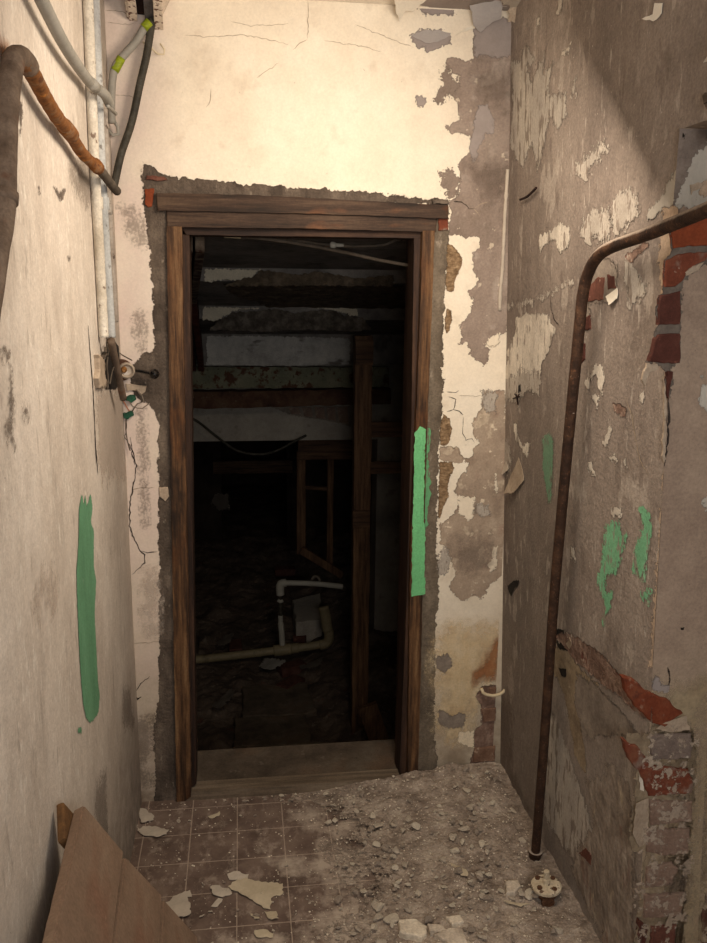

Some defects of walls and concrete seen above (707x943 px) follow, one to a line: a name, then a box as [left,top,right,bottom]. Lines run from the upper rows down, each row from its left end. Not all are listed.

crack [189,7,410,78]
peeling [642,3,663,21]
peeling [647,141,707,221]
flaking render [585,218,707,400]
peeling [93,0,524,801]
peeling [698,375,707,412]
crack [125,423,153,574]
flaking render [556,629,707,943]